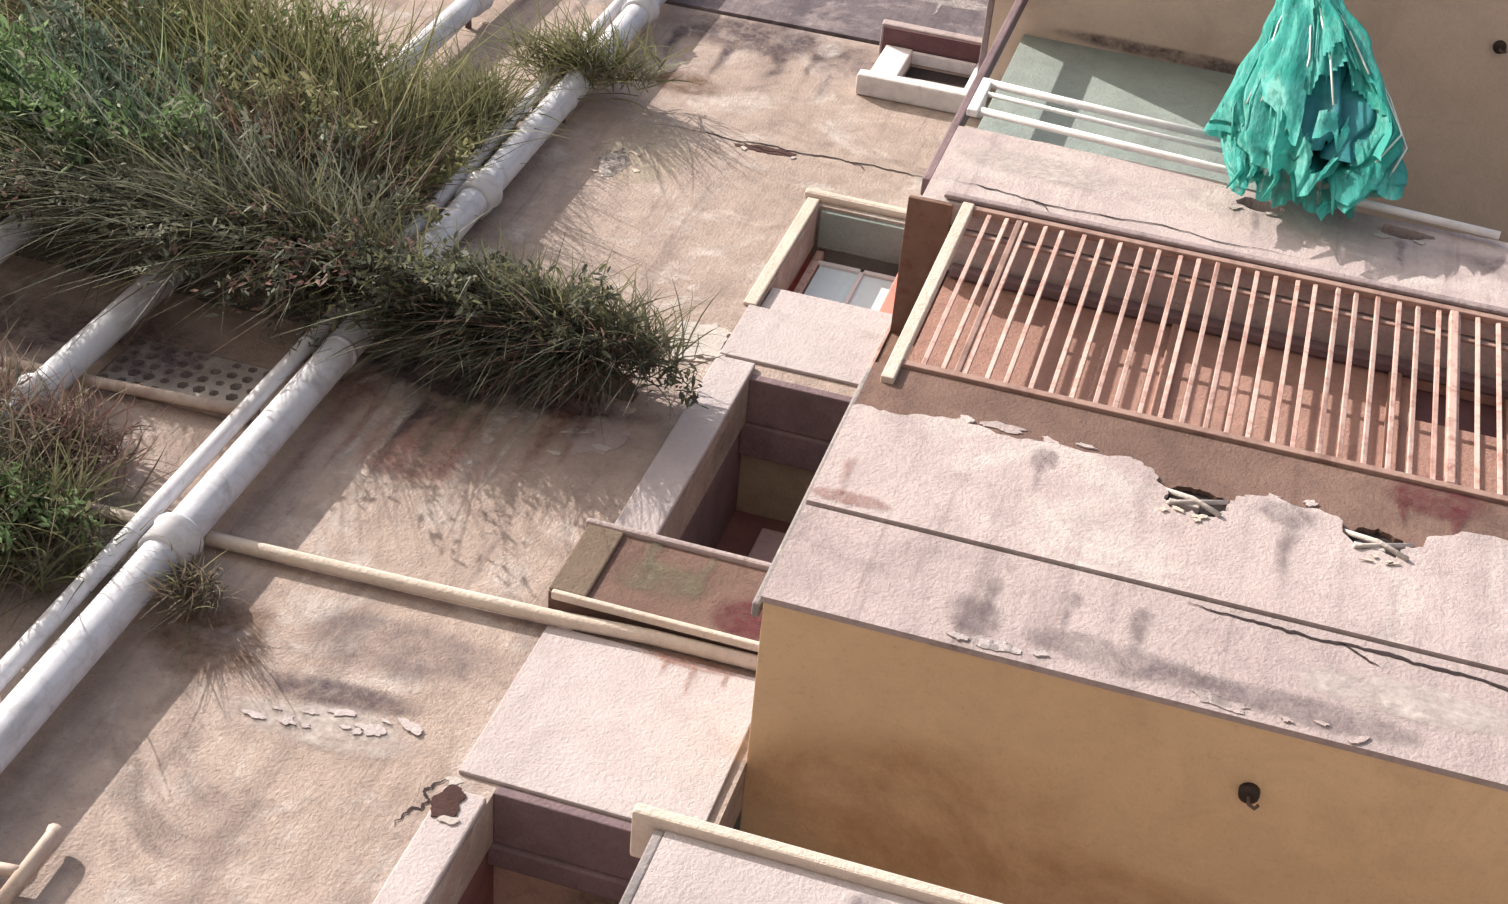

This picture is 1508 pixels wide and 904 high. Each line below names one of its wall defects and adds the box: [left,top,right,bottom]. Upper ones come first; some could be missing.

crack [646,122,1290,256]
water stain [342,355,602,475]
peeling [957,415,1098,450]
spalling [1160,487,1229,522]
spalling [1342,529,1414,565]
crack [1188,602,1508,691]
peeling [241,701,423,755]
spalling [430,776,466,825]